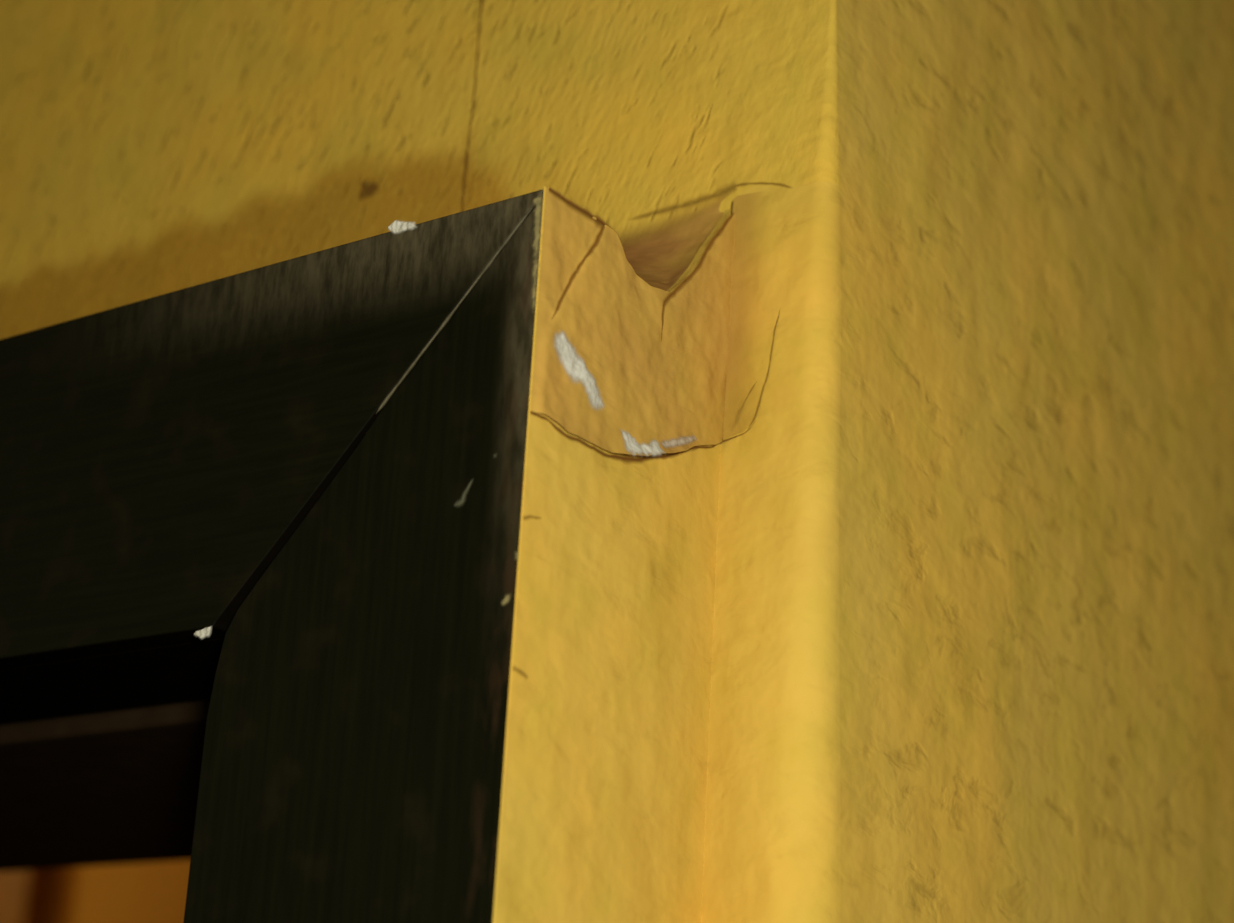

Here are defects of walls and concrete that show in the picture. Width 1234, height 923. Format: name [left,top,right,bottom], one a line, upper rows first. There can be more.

crack [461,0,483,212]
crack [377,187,623,412]
peeling [532,195,542,308]
flaking render [555,333,604,408]
flaking render [622,431,697,455]